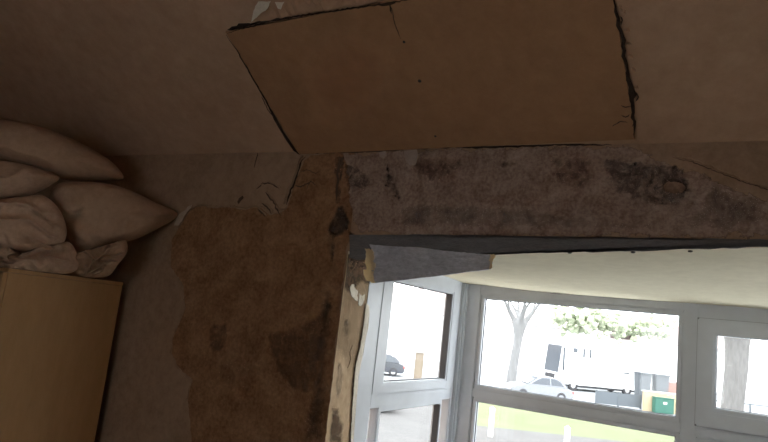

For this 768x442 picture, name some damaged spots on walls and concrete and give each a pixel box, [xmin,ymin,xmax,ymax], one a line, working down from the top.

crack [227,0,407,205]
crack [429,0,639,149]
damp [329,207,354,235]
flaking render [169,145,768,442]
damp [605,160,689,203]